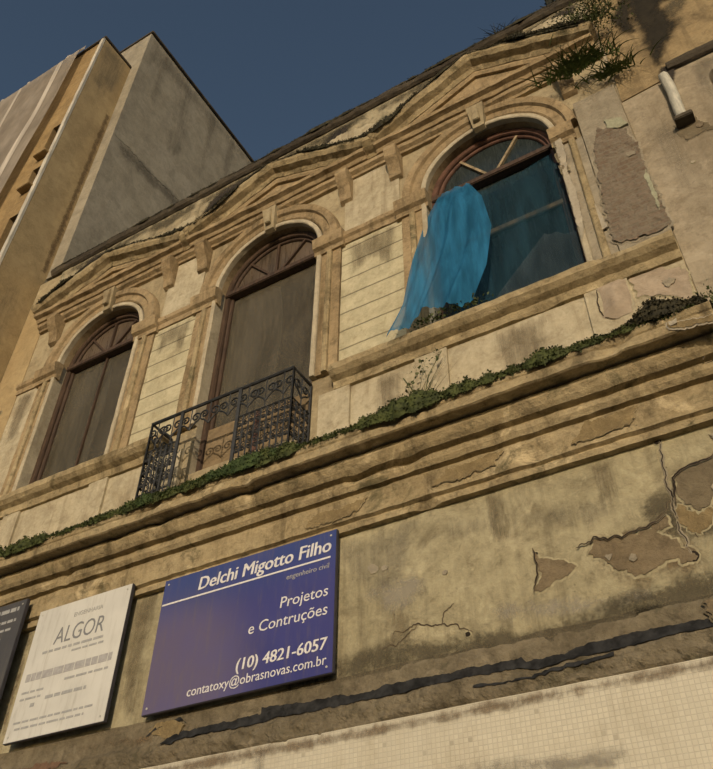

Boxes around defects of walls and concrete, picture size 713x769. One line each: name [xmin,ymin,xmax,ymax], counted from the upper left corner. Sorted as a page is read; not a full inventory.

leakage [611,0,684,80]
spalling [552,117,675,245]
spalling [576,453,713,580]
spalling [532,548,579,595]
crack [381,603,473,650]